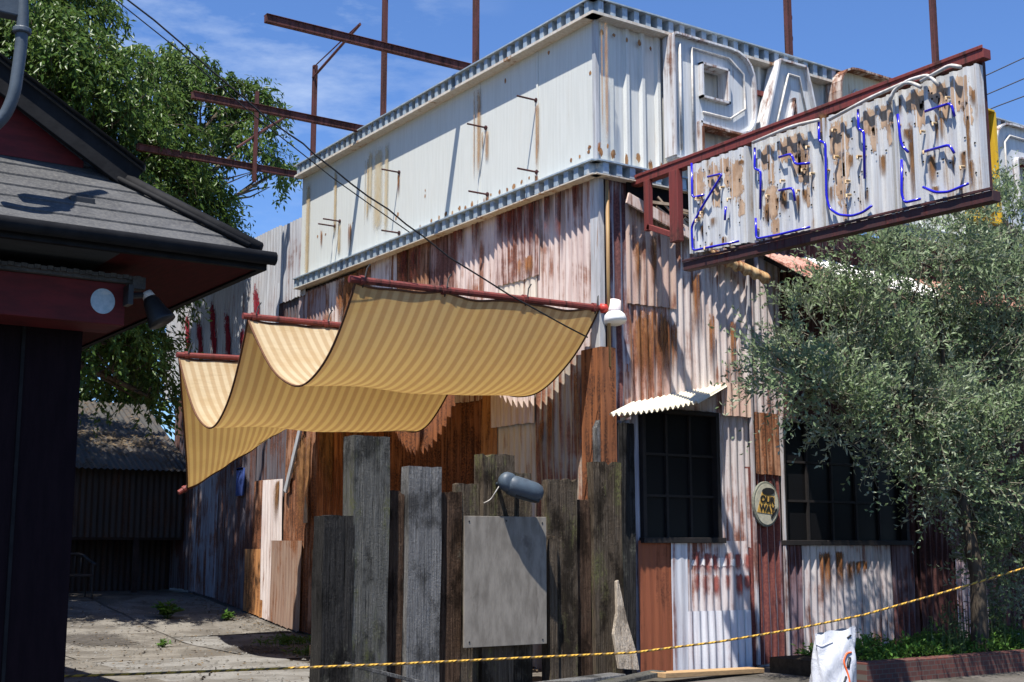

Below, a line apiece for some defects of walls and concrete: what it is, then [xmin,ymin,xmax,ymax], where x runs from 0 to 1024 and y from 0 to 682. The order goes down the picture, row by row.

rust [570,24,662,169]
rust [473,93,488,163]
rust [454,222,478,246]
rust [430,176,537,222]
rust [497,185,578,236]
rust [635,236,657,279]
rust [629,310,677,369]
rust [692,274,715,356]
rust [539,399,552,454]
rust [294,432,361,507]
rust [694,551,750,594]
rust [819,551,867,584]